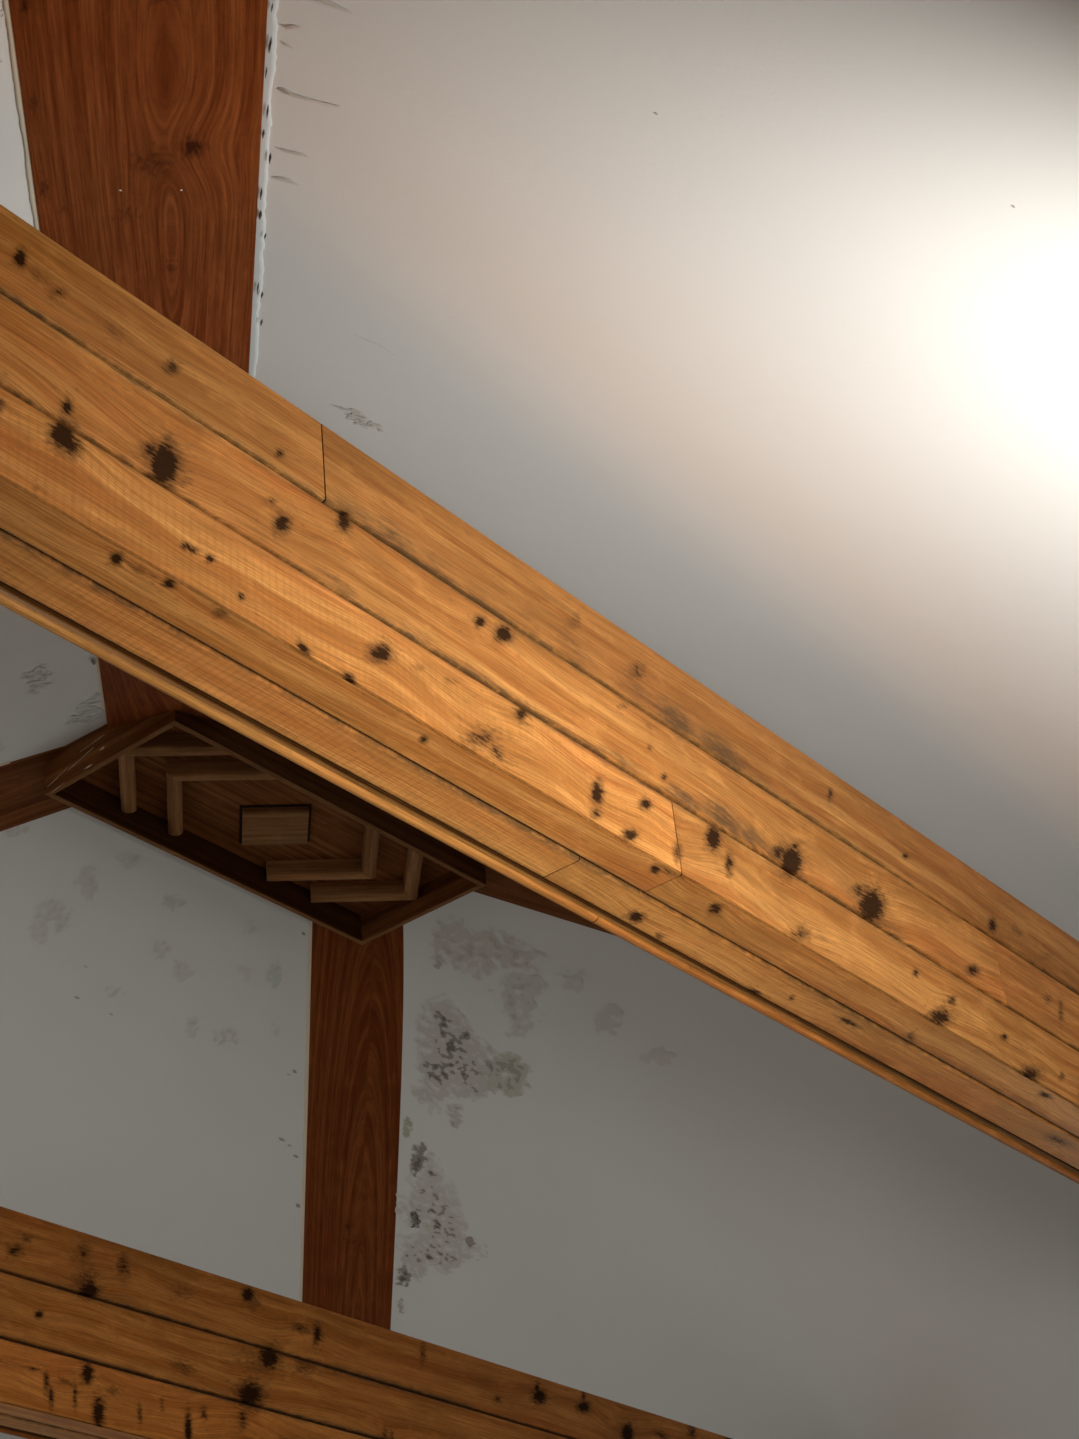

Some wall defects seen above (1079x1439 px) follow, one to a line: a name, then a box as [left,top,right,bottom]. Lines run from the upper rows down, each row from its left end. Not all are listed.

mould [410,914,624,1132]
mould [395,1116,489,1319]